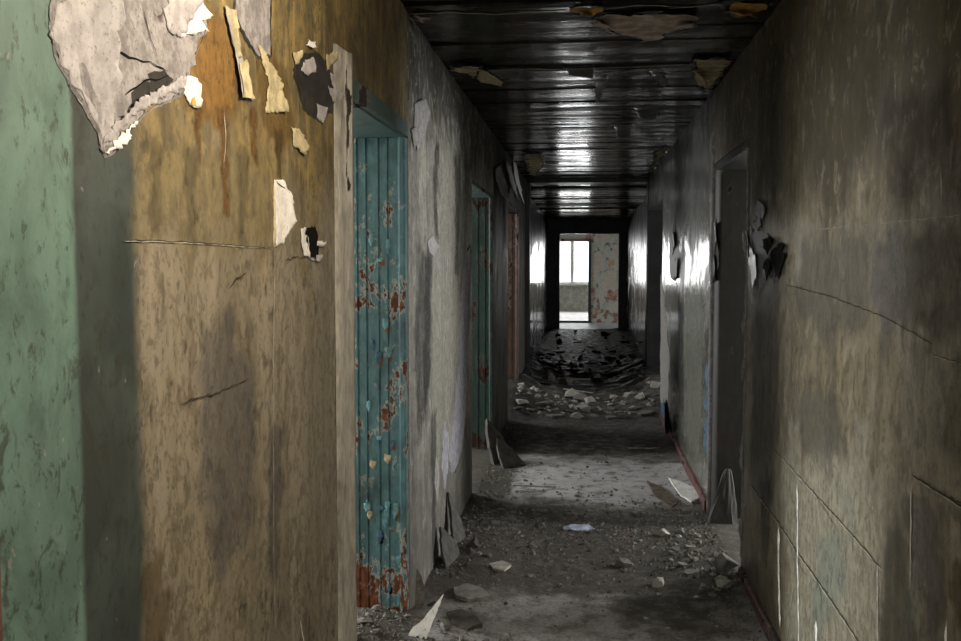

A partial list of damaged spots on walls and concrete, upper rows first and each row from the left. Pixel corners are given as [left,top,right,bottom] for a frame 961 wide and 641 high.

flaking render [225,0,272,59]
peeling [568,3,699,42]
peeling [48,0,213,158]
peeling [265,84,289,114]
peeling [293,39,344,123]
peeling [564,65,611,105]
peeling [291,127,310,156]
peeling [273,179,326,262]
peeling [742,199,788,298]
crack [788,285,961,364]
leakage [782,395,883,641]
crack [911,474,961,508]